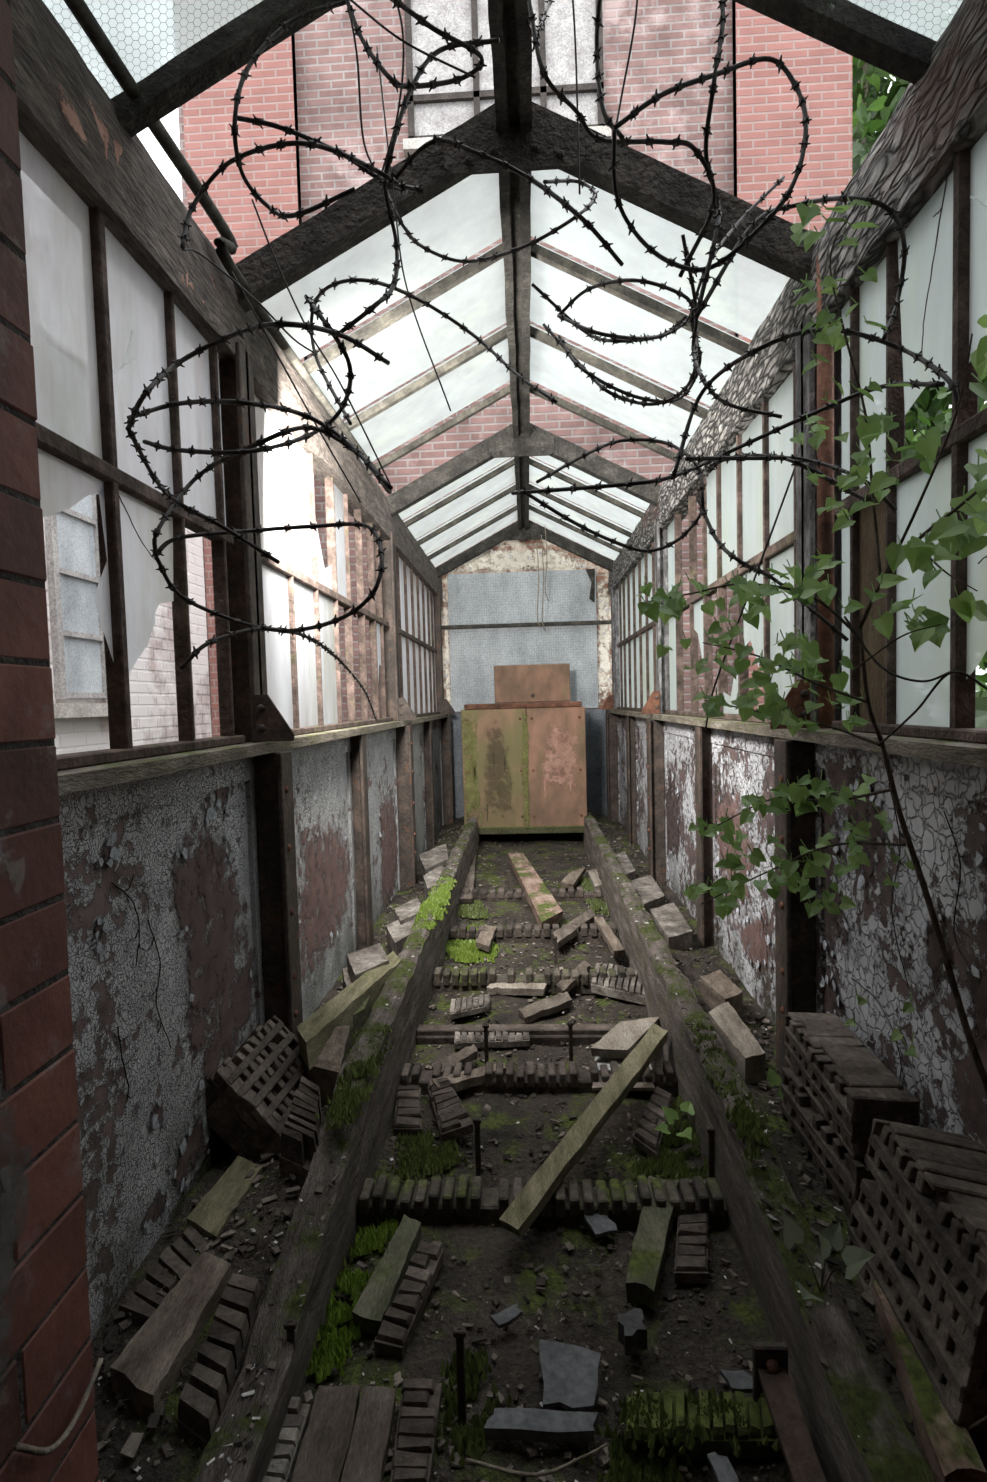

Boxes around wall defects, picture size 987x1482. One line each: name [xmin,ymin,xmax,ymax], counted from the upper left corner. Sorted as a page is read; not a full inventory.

peeling [98,830,122,868]
peeling [141,774,258,1233]
peeling [297,814,355,983]
peeling [716,789,772,971]
peeling [815,770,885,1016]
peeling [918,900,950,989]
peeling [928,762,987,867]
peeling [960,964,987,1048]